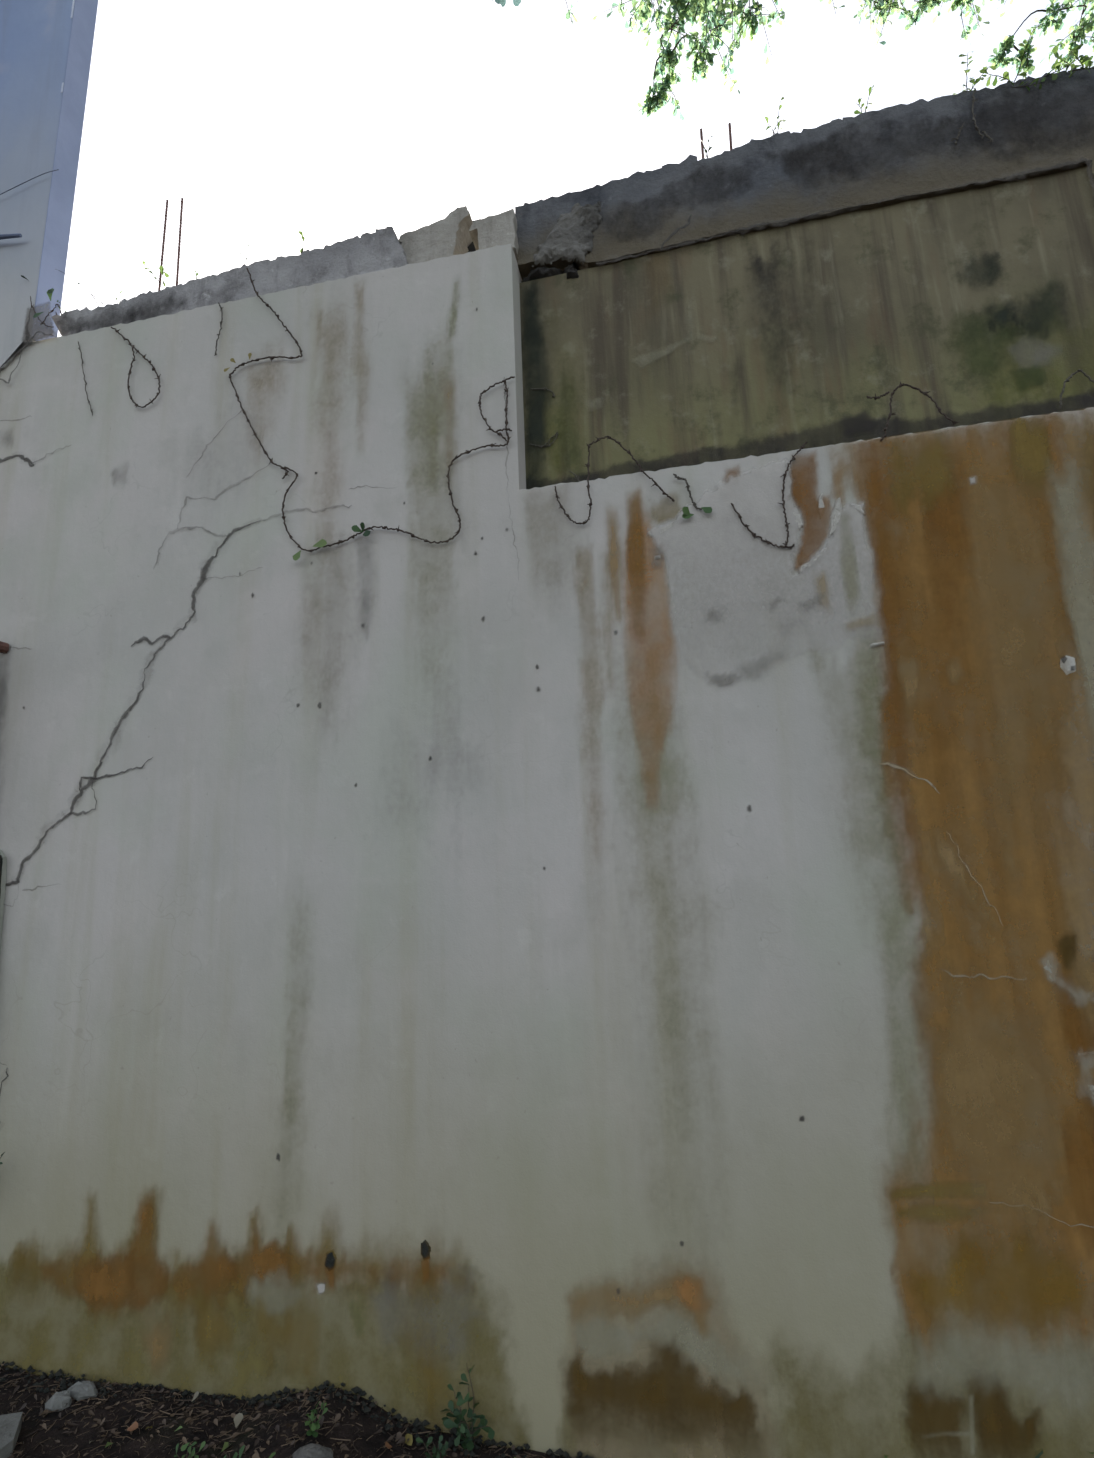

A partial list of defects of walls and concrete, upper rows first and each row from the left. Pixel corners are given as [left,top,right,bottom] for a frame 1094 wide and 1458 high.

spalling [521,201,603,283]
crack [0,308,54,383]
water stain [522,283,546,489]
crack [0,455,34,466]
rust [610,498,664,608]
crack [6,520,261,886]
rust [791,413,1094,1349]
rust [14,1199,336,1315]
water stain [0,1259,527,1448]
water stain [567,1314,768,1458]